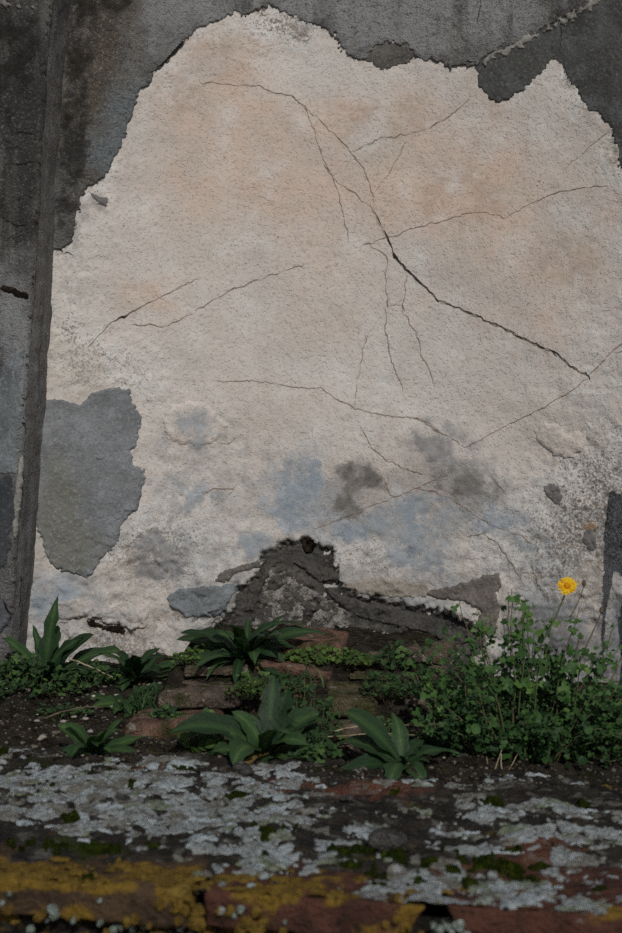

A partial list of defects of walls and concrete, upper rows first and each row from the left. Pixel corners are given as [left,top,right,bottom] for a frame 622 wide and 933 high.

flaking render [365,42,414,70]
spalling [482,0,600,66]
spalling [90,192,108,207]
crack [89,264,304,346]
crack [200,82,622,606]
spalling [12,456,24,539]
flaking render [36,387,146,578]
flaking render [51,536,501,672]